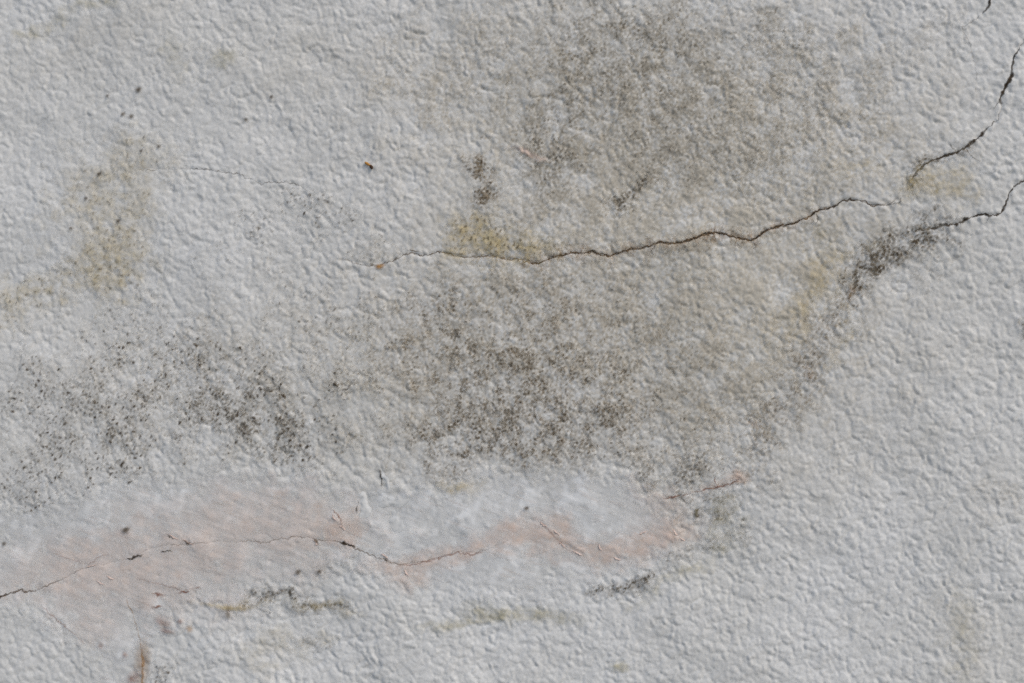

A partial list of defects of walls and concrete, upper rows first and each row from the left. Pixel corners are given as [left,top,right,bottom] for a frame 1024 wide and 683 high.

crack [910,45,1021,183]
water stain [474,158,491,204]
crack [360,198,879,268]
water stain [853,222,941,289]
crack [915,180,1024,231]